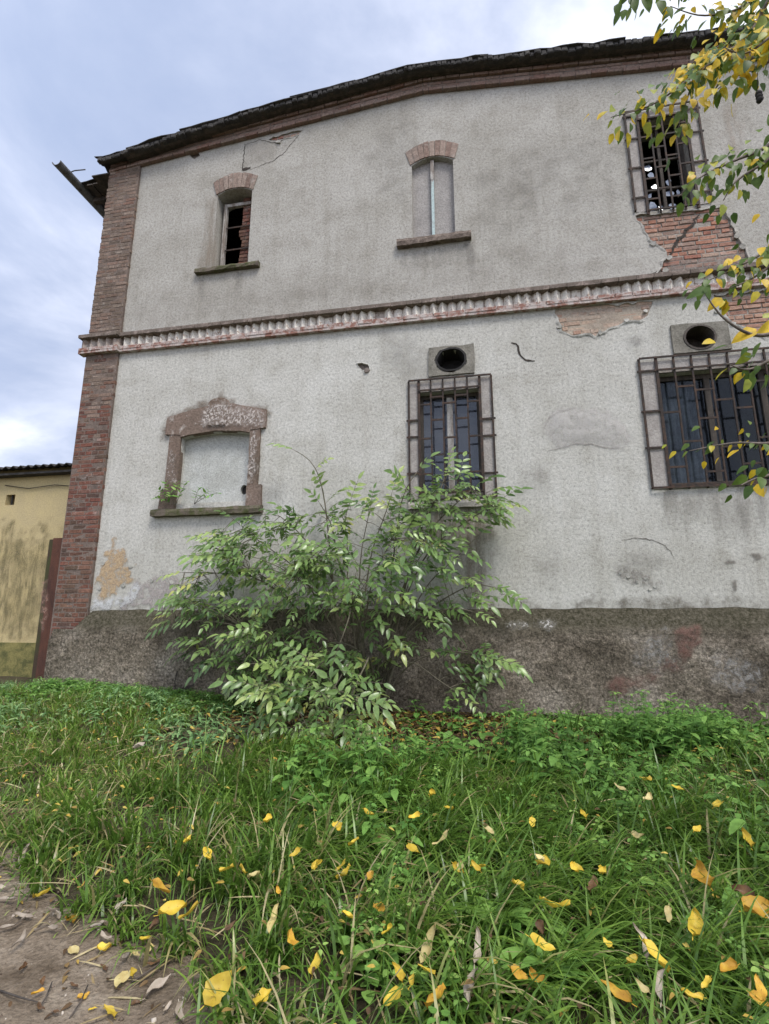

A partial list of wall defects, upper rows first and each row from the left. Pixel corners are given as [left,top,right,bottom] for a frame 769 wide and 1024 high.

crack [242,135,299,171]
spalling [633,205,750,273]
spalling [553,300,655,339]
crack [511,342,535,361]
peeling [92,538,198,610]